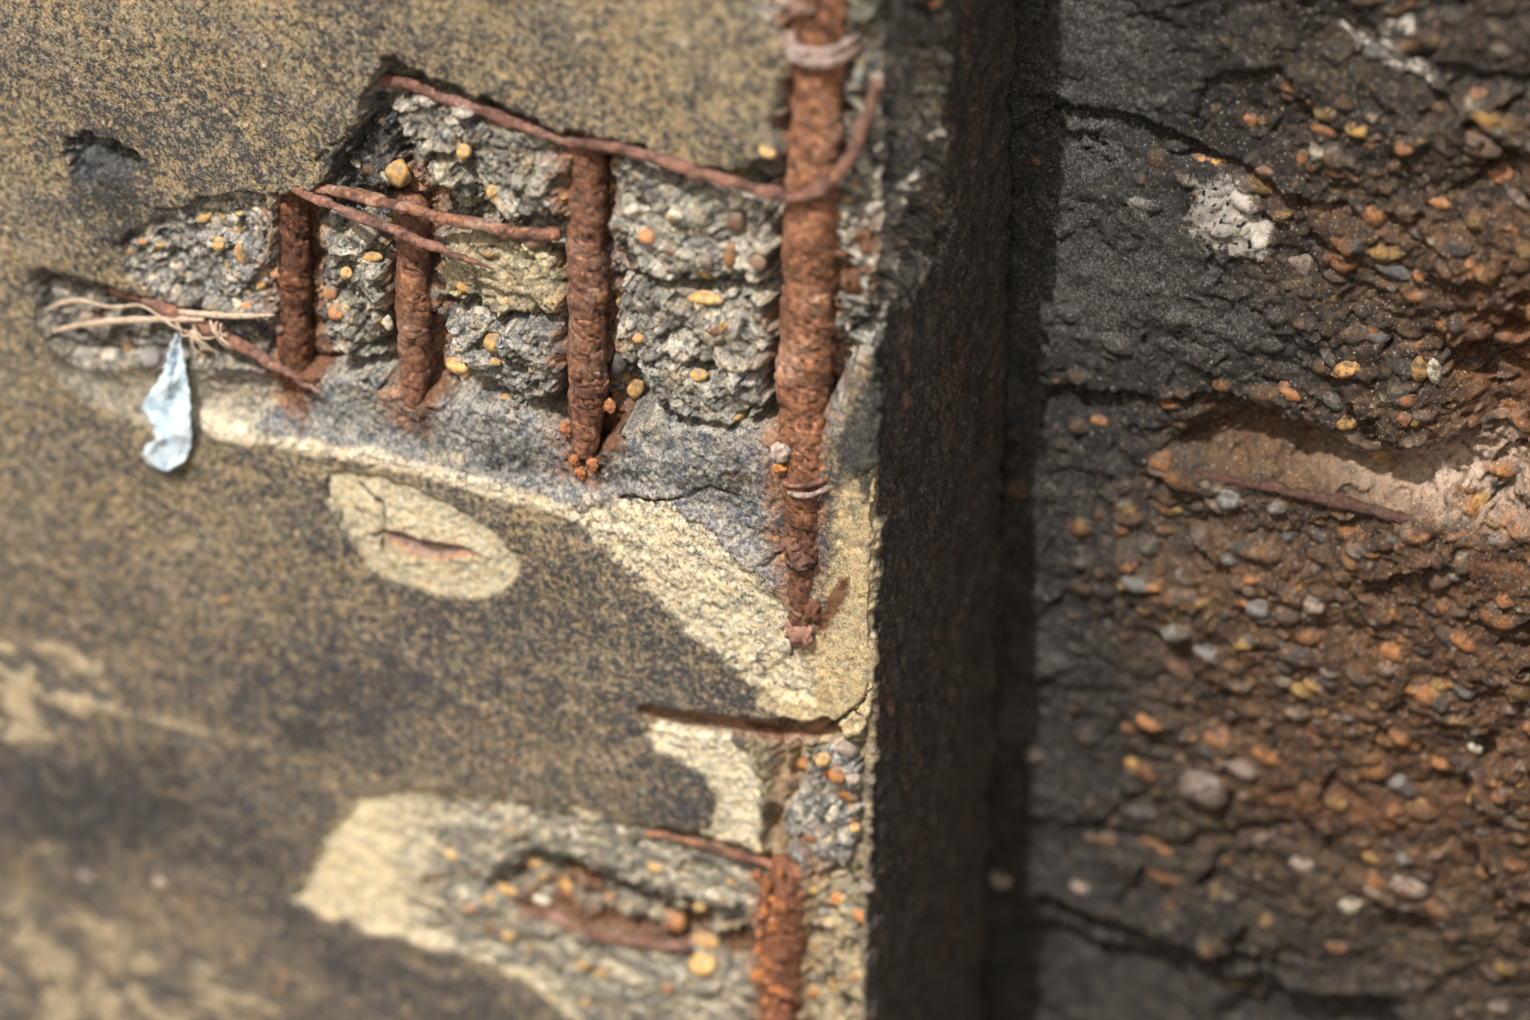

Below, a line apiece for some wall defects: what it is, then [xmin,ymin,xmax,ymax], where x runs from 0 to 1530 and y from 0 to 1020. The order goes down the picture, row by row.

corrosion [788,0,820,17]
water stain [1002,0,1323,414]
corrosion [836,221,881,295]
corrosion [278,336,343,434]
corrosion [418,355,461,433]
corrosion [568,396,636,484]
corrosion [725,427,792,489]
spalling [1153,290,1530,545]
corrosion [1469,293,1530,463]
spalling [0,0,957,1020]
corrosion [780,536,816,572]
corrosion [784,577,850,649]